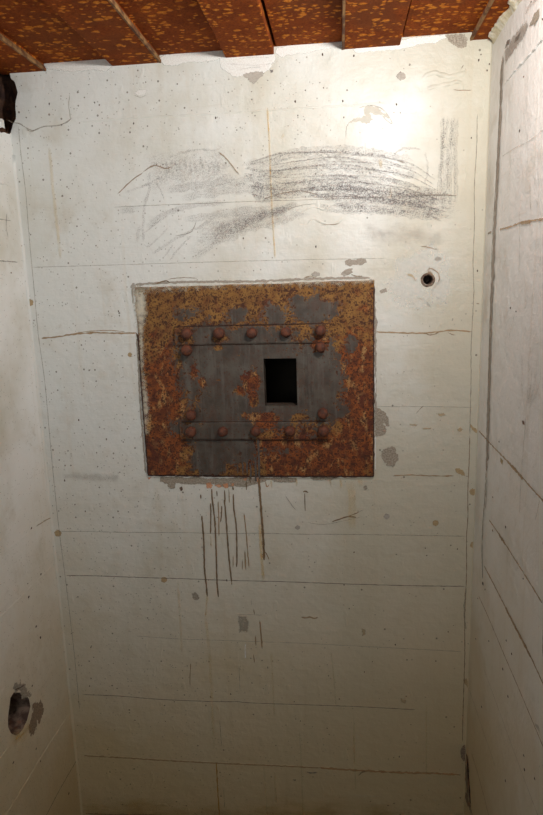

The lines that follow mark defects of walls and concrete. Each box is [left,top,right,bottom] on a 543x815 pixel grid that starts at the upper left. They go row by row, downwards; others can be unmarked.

crack [42,330,136,339]
rust [137,287,375,560]
crack [67,58,543,746]
rust [201,487,249,597]
spalling [13,679,44,736]